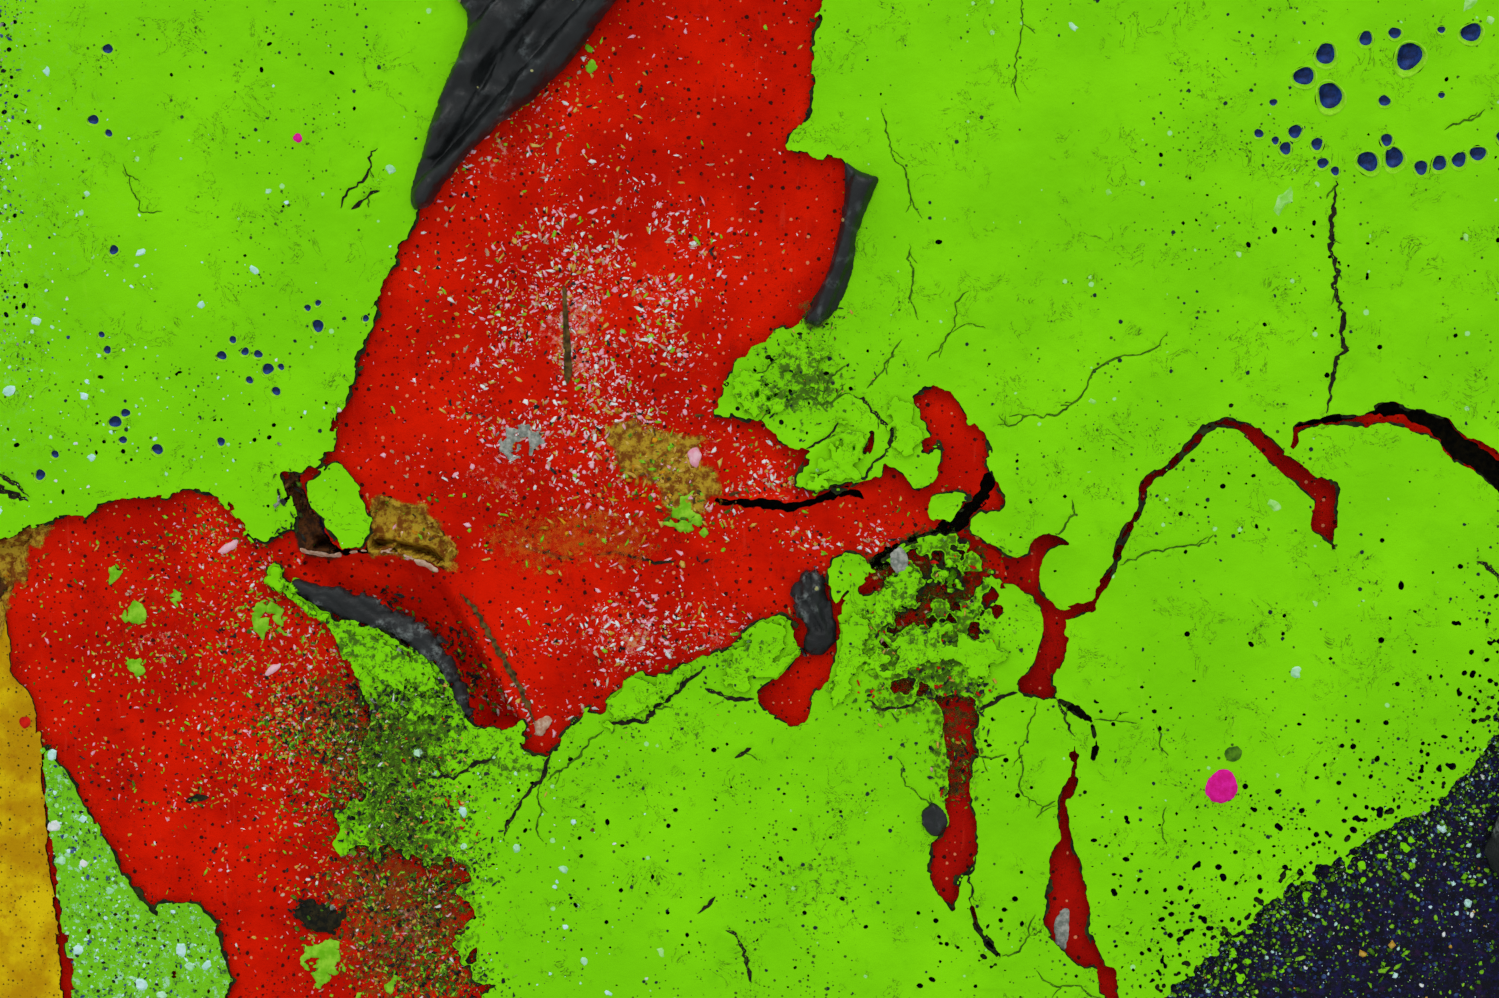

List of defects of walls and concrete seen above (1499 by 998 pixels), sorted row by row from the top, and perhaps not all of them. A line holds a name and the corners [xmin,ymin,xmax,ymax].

peeling [2,0,1023,998]
crack [868,181,1499,998]